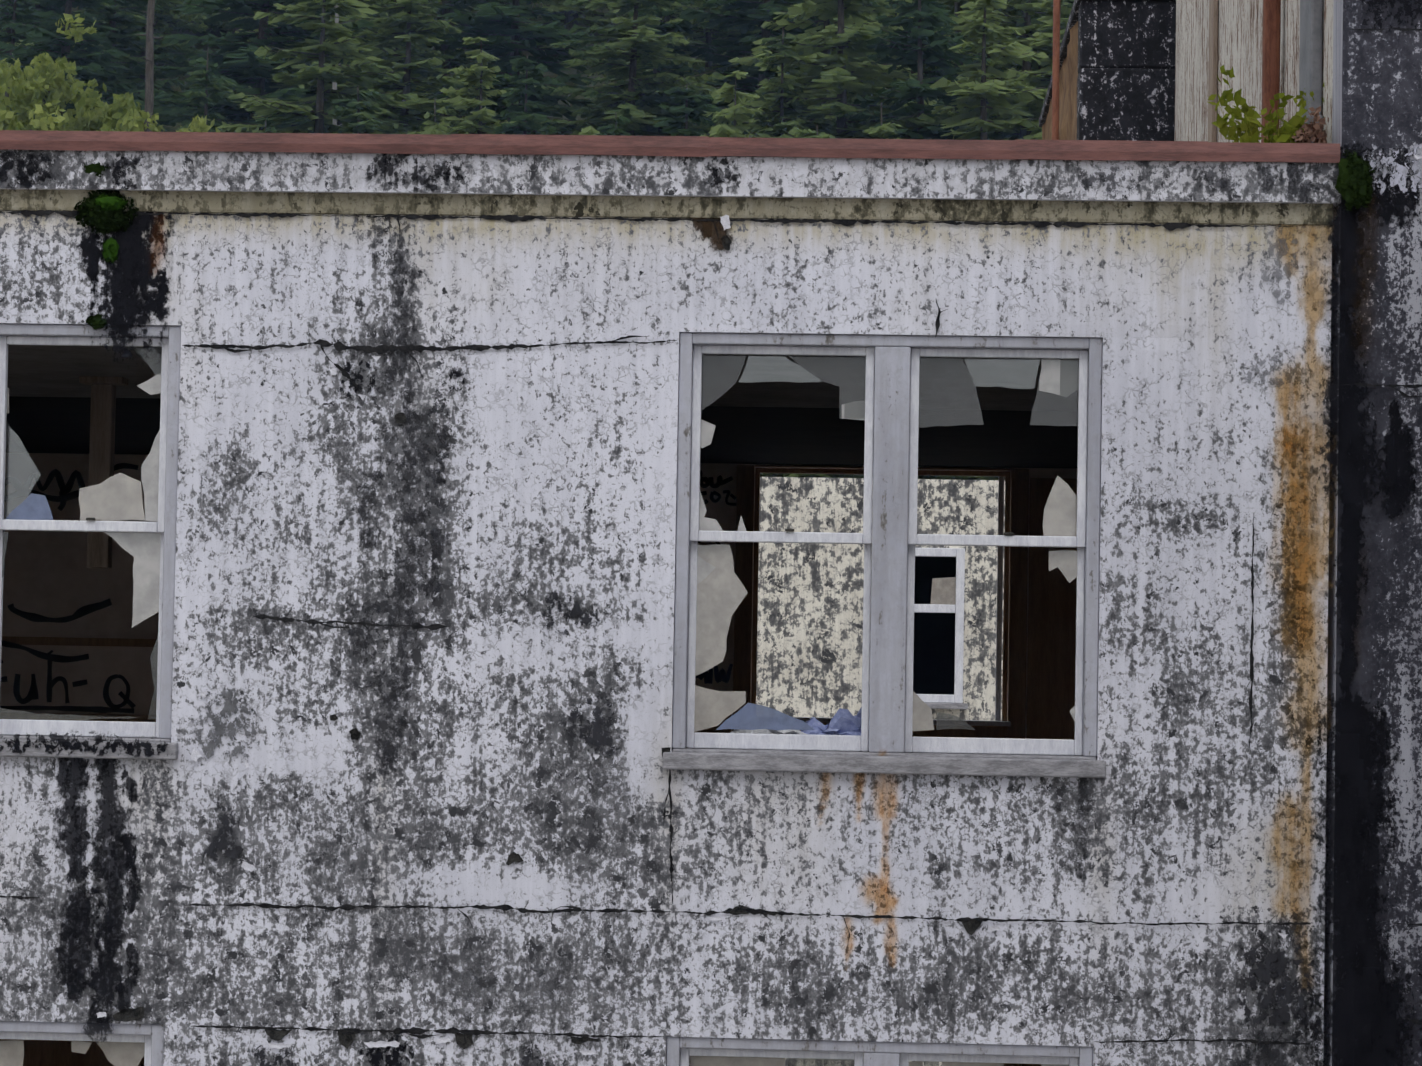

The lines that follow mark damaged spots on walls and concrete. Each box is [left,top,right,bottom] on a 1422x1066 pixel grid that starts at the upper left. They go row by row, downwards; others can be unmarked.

damp [0,150,61,191]
damp [365,154,464,191]
damp [702,156,741,193]
damp [77,211,177,362]
crack [182,335,677,388]
crack [254,614,450,632]
damp [335,214,456,775]
rust [1270,211,1337,920]
damp [1192,141,1422,1066]
damp [0,731,172,1043]
crack [188,770,1311,953]
rust [856,773,898,967]